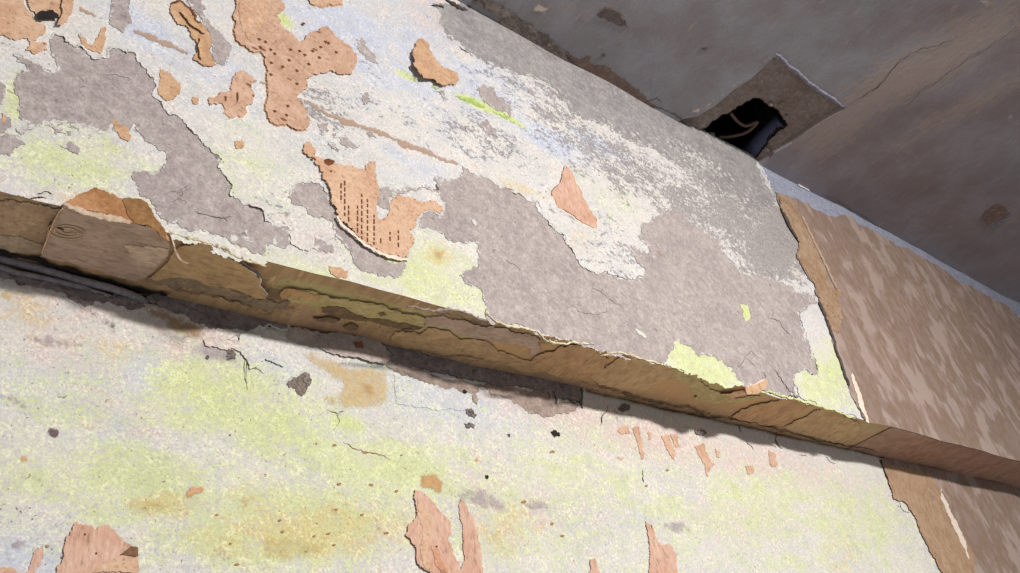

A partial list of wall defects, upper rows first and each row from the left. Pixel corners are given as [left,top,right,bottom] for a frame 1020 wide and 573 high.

crack [863,32,1009,100]
flaking render [0,0,857,428]
crack [177,291,261,389]
crack [437,312,486,325]
leakage [309,355,387,407]
peeling [618,426,681,460]
peeling [694,428,720,476]
peeling [56,522,139,573]
peeling [406,490,483,573]
peeling [646,522,678,573]